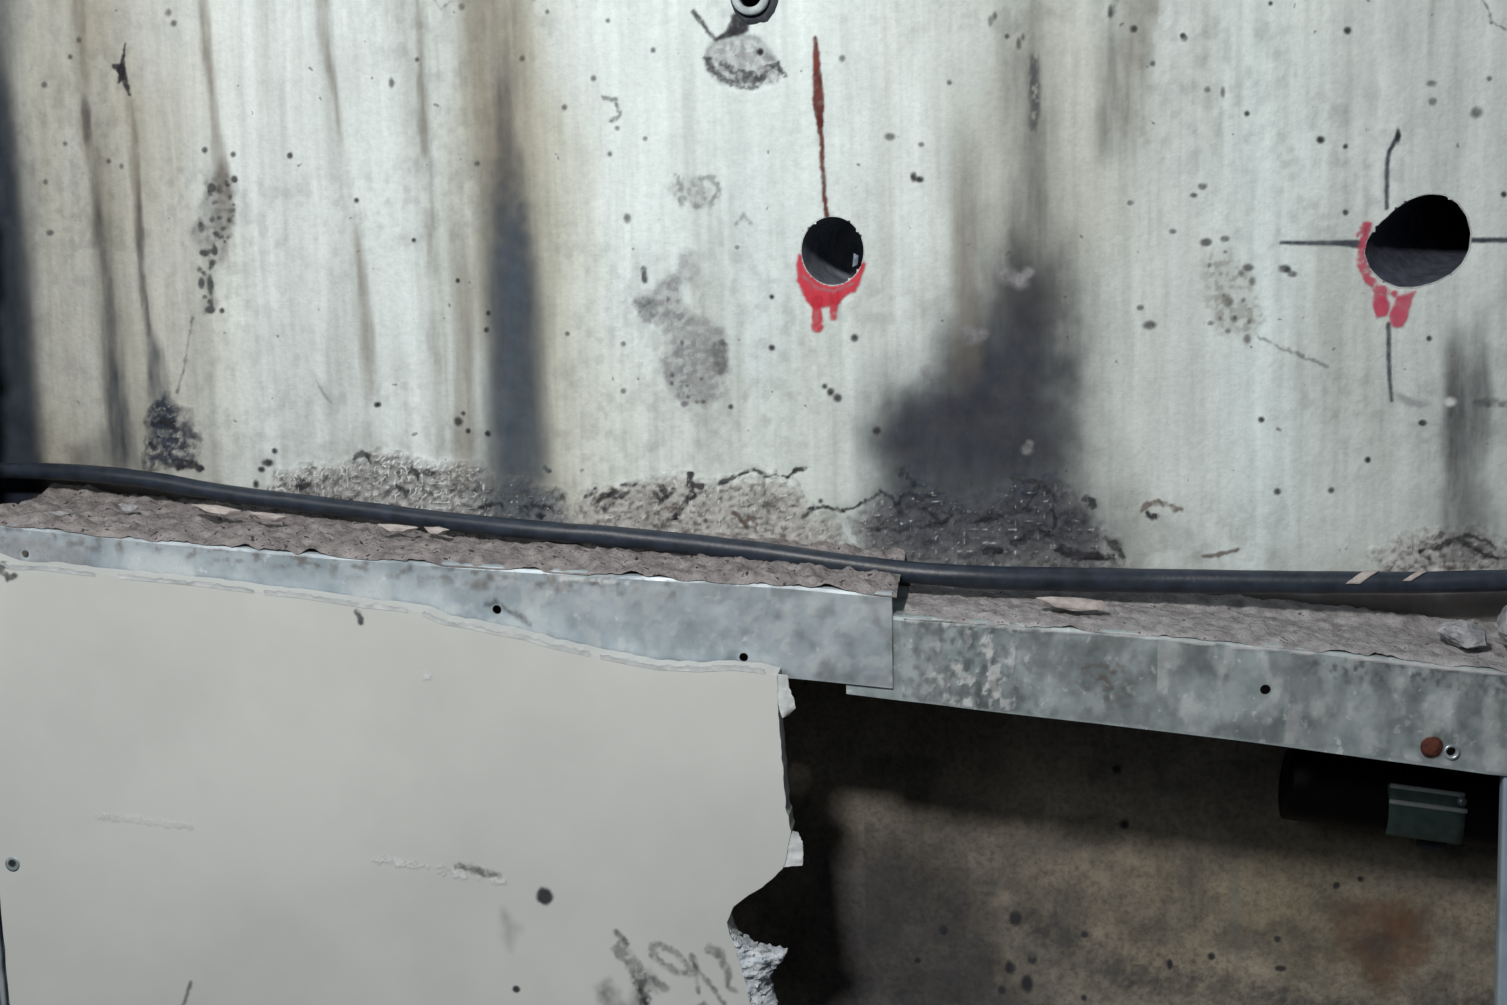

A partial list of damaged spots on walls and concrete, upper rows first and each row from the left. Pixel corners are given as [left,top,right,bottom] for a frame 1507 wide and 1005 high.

water stain [0,80,39,504]
water stain [491,173,544,504]
water stain [879,272,1070,536]
spalling [729,928,788,1005]